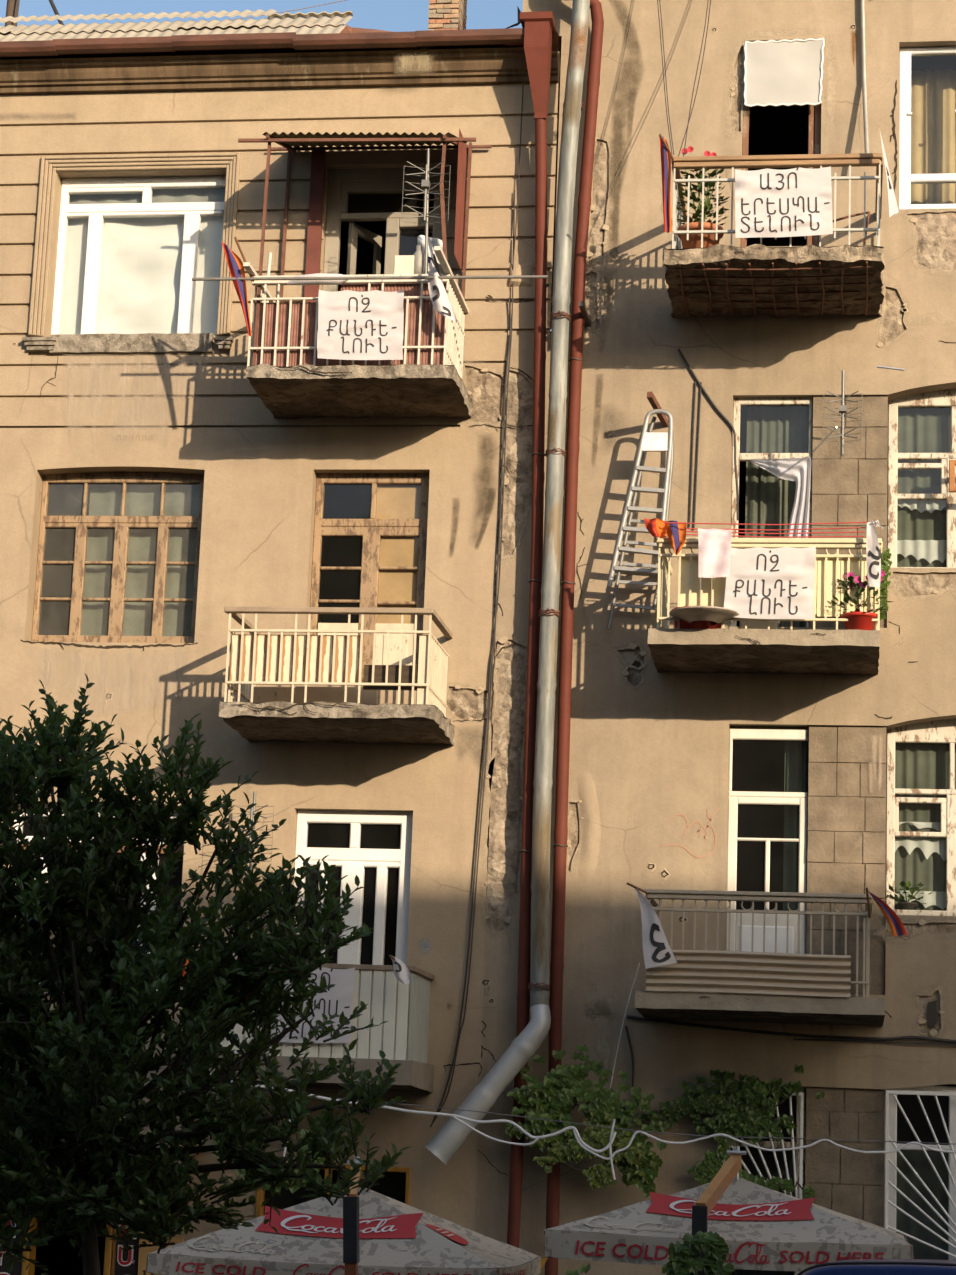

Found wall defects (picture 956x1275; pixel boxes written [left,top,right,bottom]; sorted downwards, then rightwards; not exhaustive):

leakage [610,1,640,241]
spalling [675,261,908,348]
spalling [464,364,507,427]
spalling [446,636,527,721]